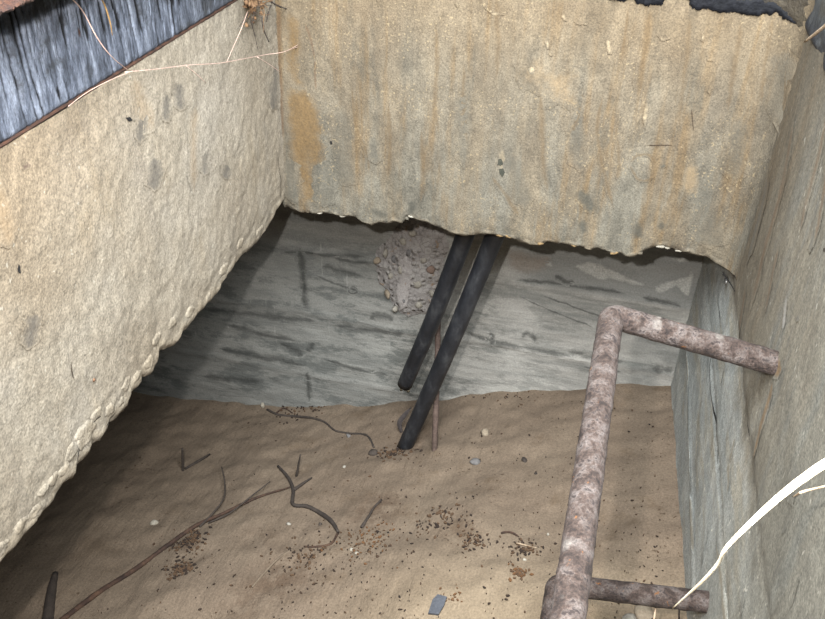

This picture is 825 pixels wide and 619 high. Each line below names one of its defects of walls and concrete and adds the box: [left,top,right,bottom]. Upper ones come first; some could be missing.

peeling [689,0,809,27]
corrosion [276,0,332,208]
water stain [511,40,592,173]
water stain [762,40,799,133]
water stain [284,100,385,208]
water stain [367,201,418,221]
water stain [573,187,599,237]